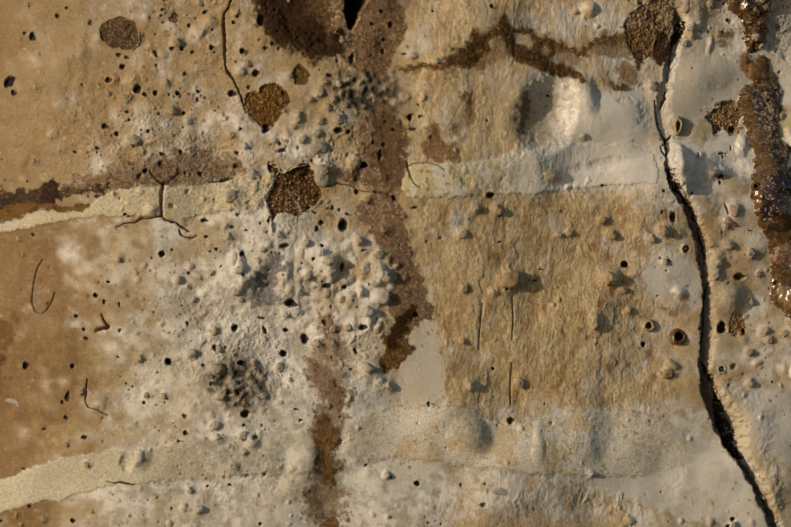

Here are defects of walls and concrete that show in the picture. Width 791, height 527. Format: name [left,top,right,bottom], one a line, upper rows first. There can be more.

spalling [100,17,142,69]
crack [222,0,247,113]
spalling [292,64,310,85]
rust [252,0,670,91]
rust [718,29,734,47]
rust [740,53,771,79]
spalling [228,83,290,132]
spalling [704,101,743,137]
crack [116,170,196,239]
spalling [265,161,321,232]
damp [249,252,286,308]
crack [654,20,777,527]